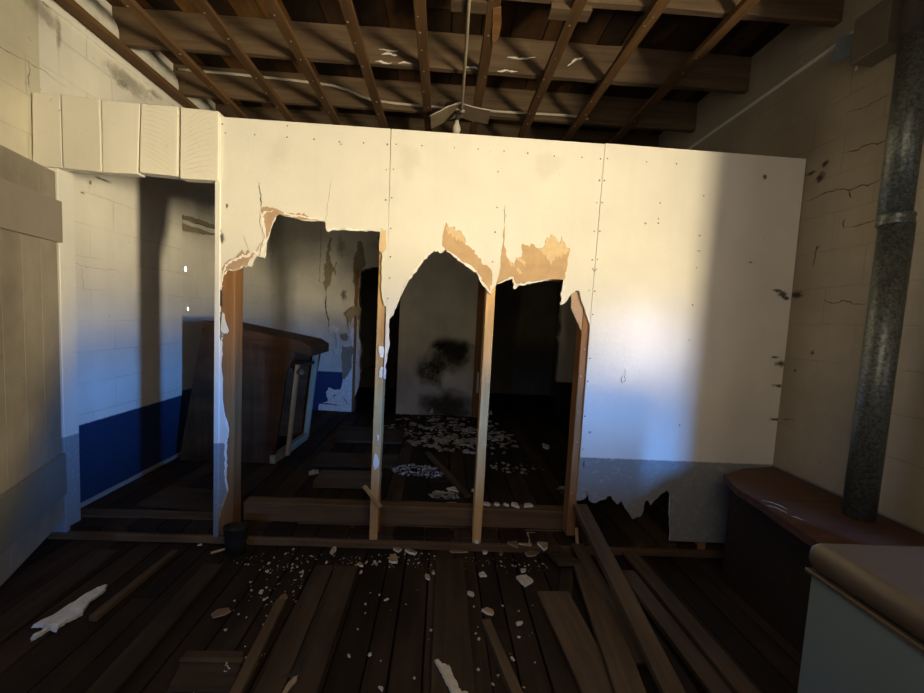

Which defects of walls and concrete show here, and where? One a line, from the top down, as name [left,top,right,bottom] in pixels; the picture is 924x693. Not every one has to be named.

crack [0,47,66,88]
crack [808,179,880,201]
spalling [401,249,548,295]
flaking render [318,227,367,412]
leakage [418,340,467,382]
leakage [422,393,470,418]